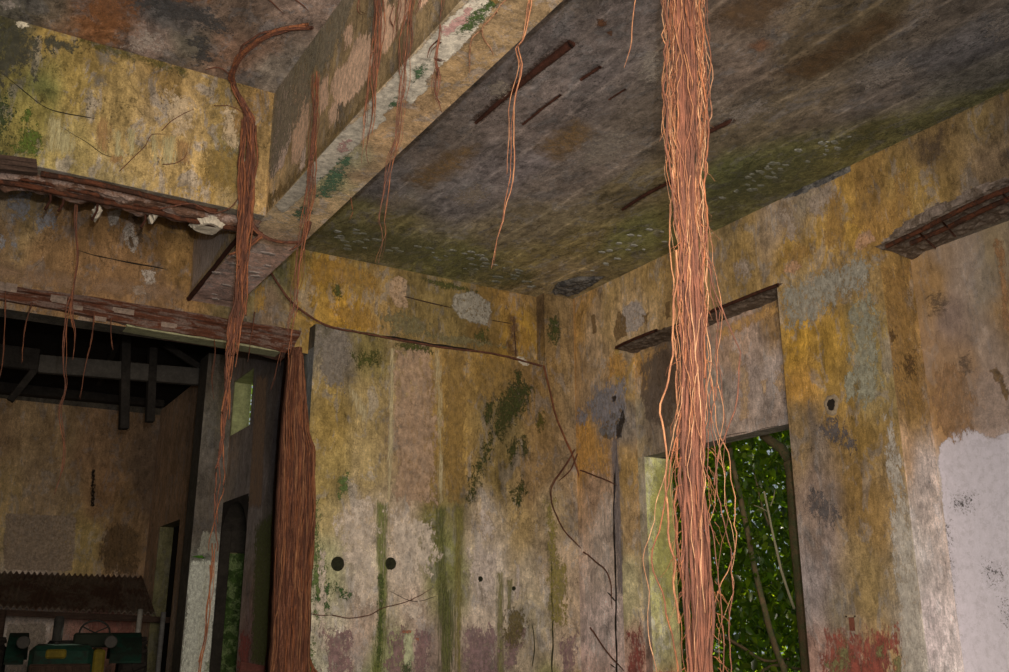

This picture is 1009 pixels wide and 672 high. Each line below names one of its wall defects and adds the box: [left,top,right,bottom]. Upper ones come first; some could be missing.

spalling [0,171,239,301]
water stain [322,301,516,504]
spalling [615,301,680,353]
spalling [704,161,1009,416]